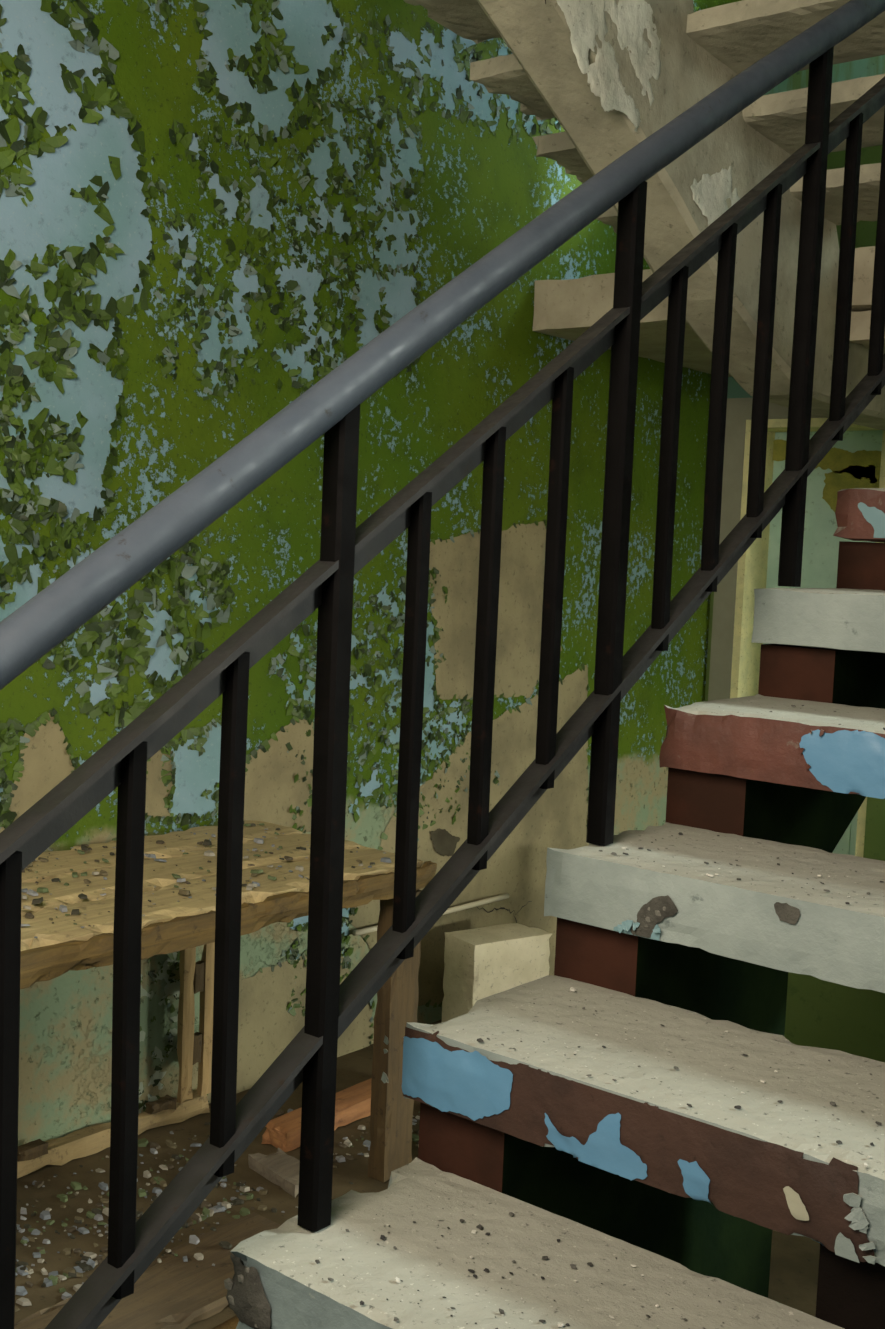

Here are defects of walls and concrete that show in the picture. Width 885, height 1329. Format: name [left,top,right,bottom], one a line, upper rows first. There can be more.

peeling [557,0,661,132]
peeling [0,0,560,622]
flaking render [0,708,78,833]
peeling [38,537,235,731]
peeling [145,718,222,827]
flaking render [244,624,317,833]
flaking render [417,530,480,875]
flaking render [418,740,589,1008]
flaking render [489,519,546,812]
peeling [798,729,885,799]
flaking render [236,916,308,1094]
peeling [337,998,876,1264]